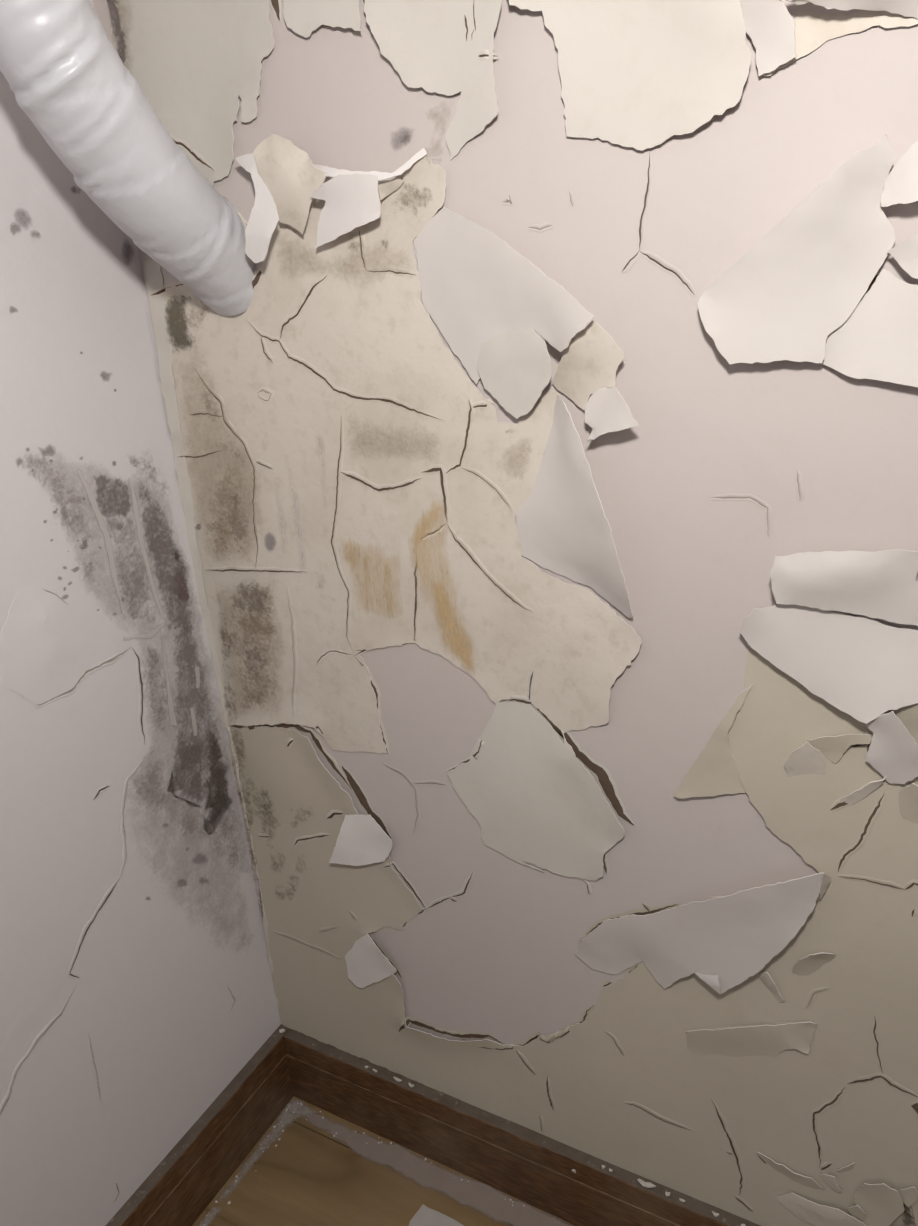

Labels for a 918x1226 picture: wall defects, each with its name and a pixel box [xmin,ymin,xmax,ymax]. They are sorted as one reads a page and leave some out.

water stain [107,0,125,62]
peeling [107,0,274,187]
peeling [282,0,918,160]
water stain [166,297,192,349]
water stain [77,457,249,831]
peeling [163,134,918,1226]
crack [0,645,147,1116]
crack [624,1101,690,1131]
crack [710,1015,918,1212]
crack [903,1203,914,1219]